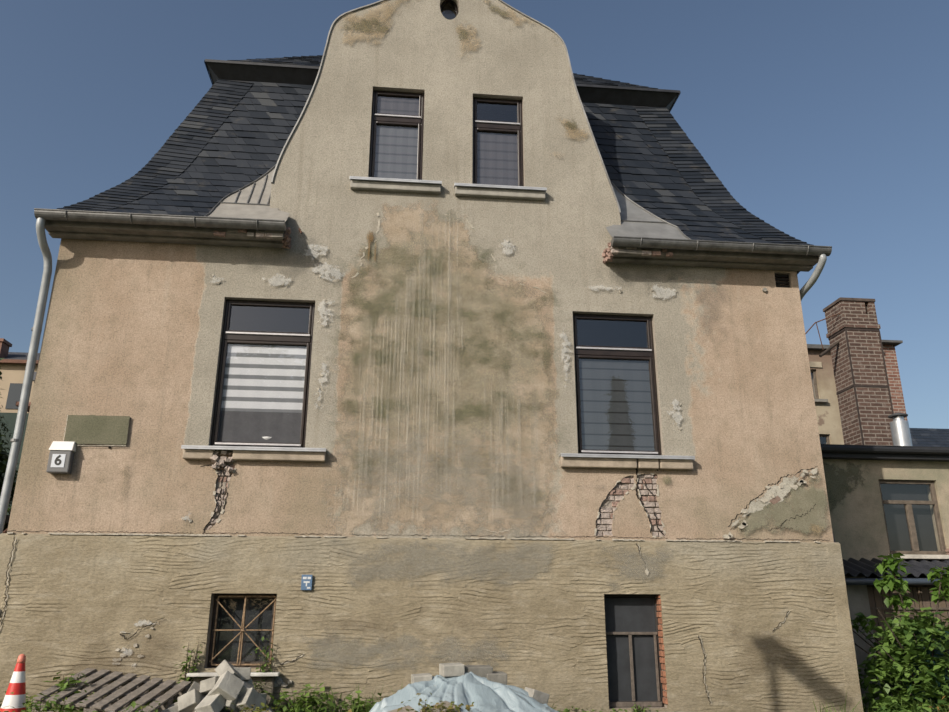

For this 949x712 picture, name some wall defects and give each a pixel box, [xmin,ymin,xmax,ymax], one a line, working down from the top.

spalling [213,227,292,249]
peeling [262,274,291,286]
peeling [304,203,572,537]
spalling [594,468,666,538]
peeling [722,466,828,539]
crack [0,450,829,629]
spalling [112,618,163,666]
crack [698,636,712,705]